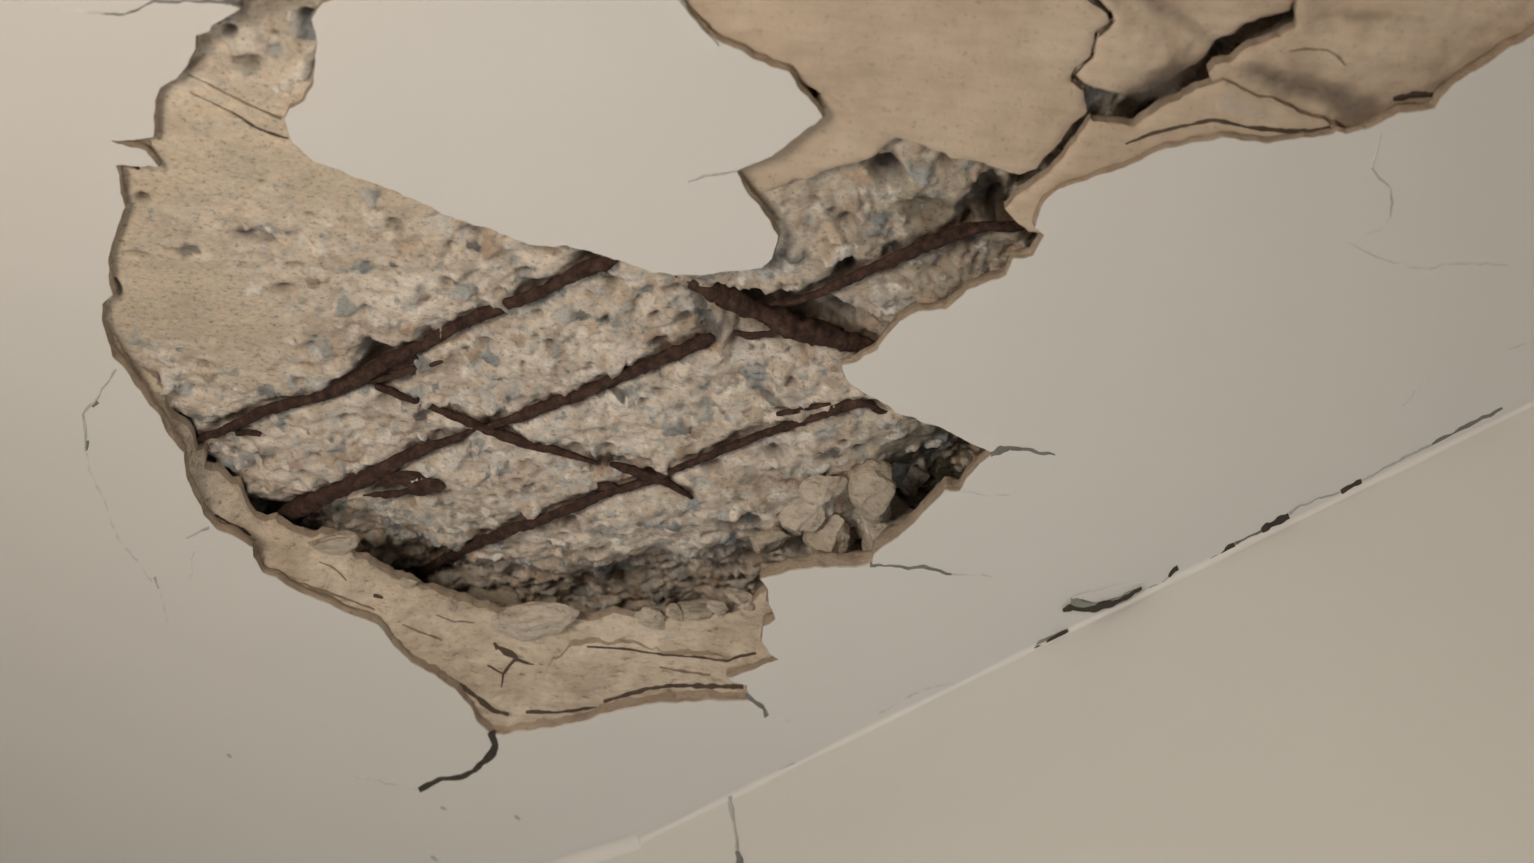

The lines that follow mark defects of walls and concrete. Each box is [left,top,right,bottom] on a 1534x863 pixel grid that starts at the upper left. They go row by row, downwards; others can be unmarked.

crack [11,0,241,16]
corrosion [196,255,888,580]
spalling [102,0,1534,735]
corrosion [675,220,1026,353]
crack [1149,407,1503,589]
crack [288,561,792,792]
crack [728,796,743,863]